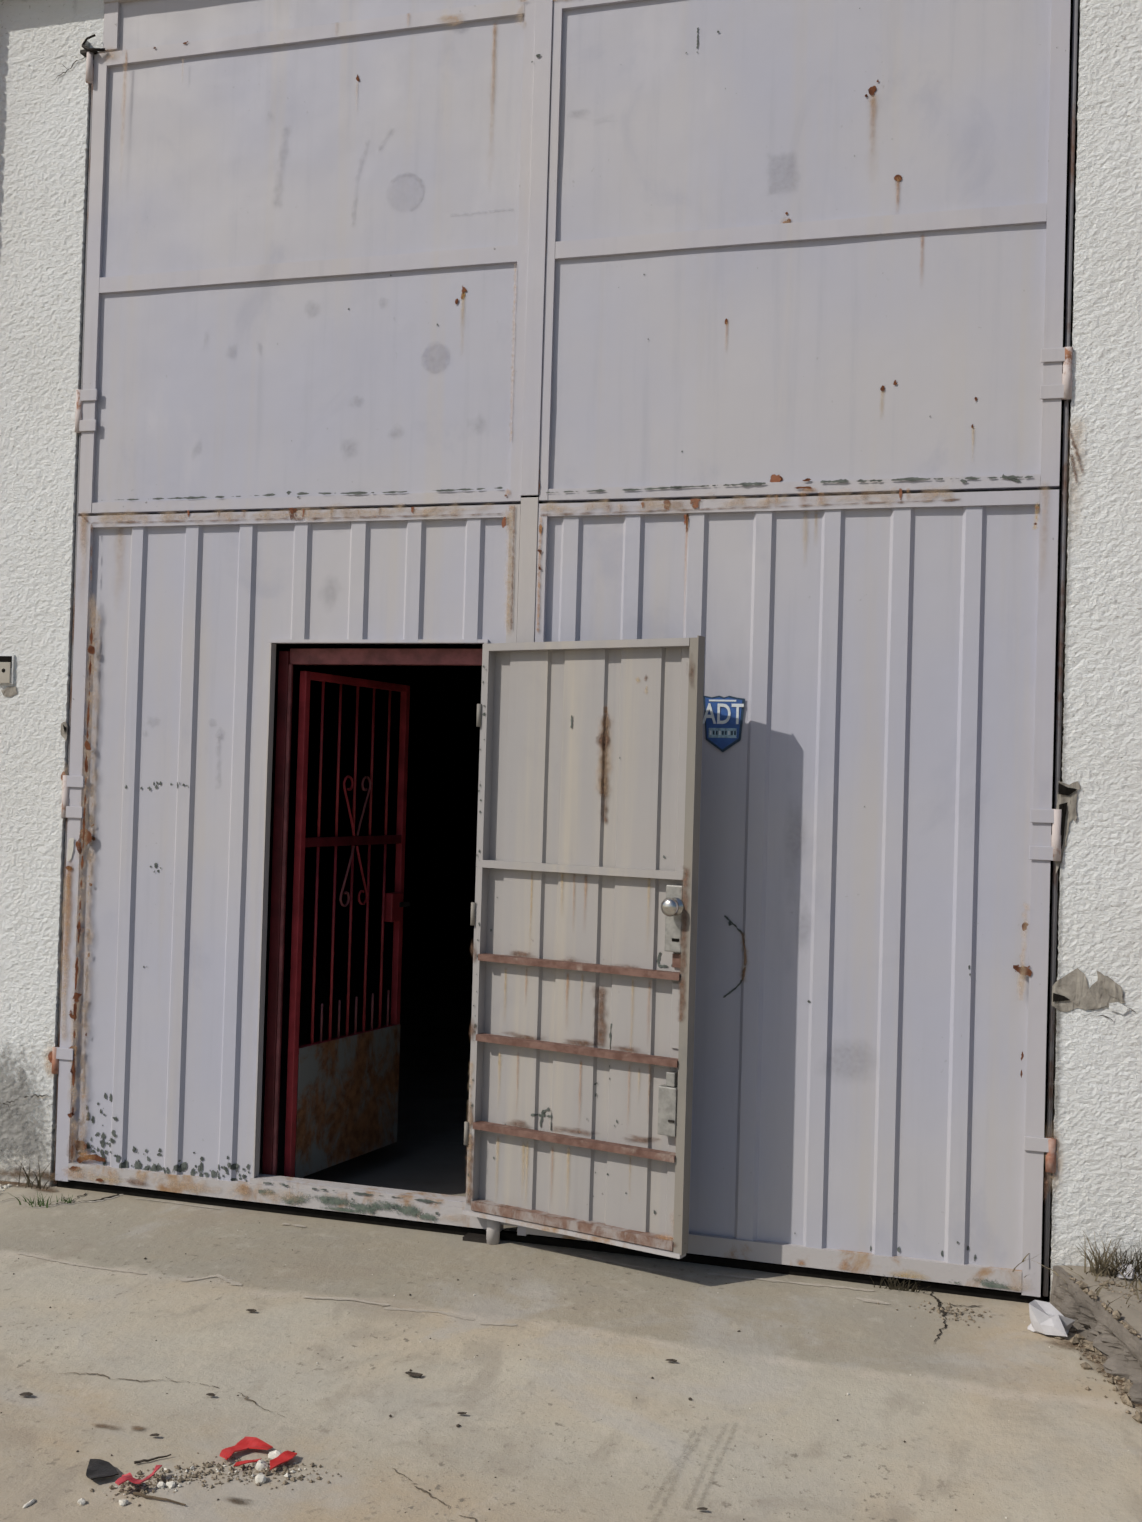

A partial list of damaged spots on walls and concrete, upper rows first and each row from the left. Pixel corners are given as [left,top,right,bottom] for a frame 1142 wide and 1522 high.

corrosion [770,474,830,506]
corrosion [264,508,336,520]
corrosion [641,498,722,532]
corrosion [599,708,620,822]
corrosion [63,612,97,1171]
spalling [1052,968,1130,1014]
leakage [0,1039,51,1173]
crack [0,1192,123,1208]
crack [393,1468,476,1522]